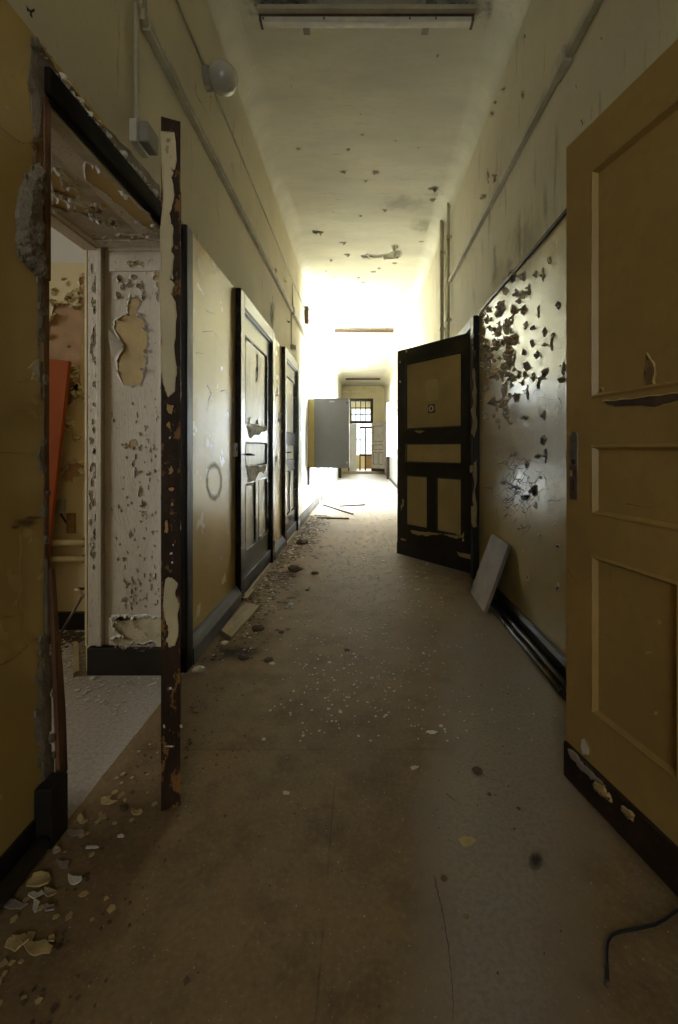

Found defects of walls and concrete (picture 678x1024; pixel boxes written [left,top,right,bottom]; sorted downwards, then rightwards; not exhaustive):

flaking render [27,36,161,244]
peeling [28,260,160,570]
peeling [325,241,402,283]
peeling [478,256,565,429]
peeling [509,435,547,469]
peeling [522,476,542,509]
flaking render [34,559,57,786]